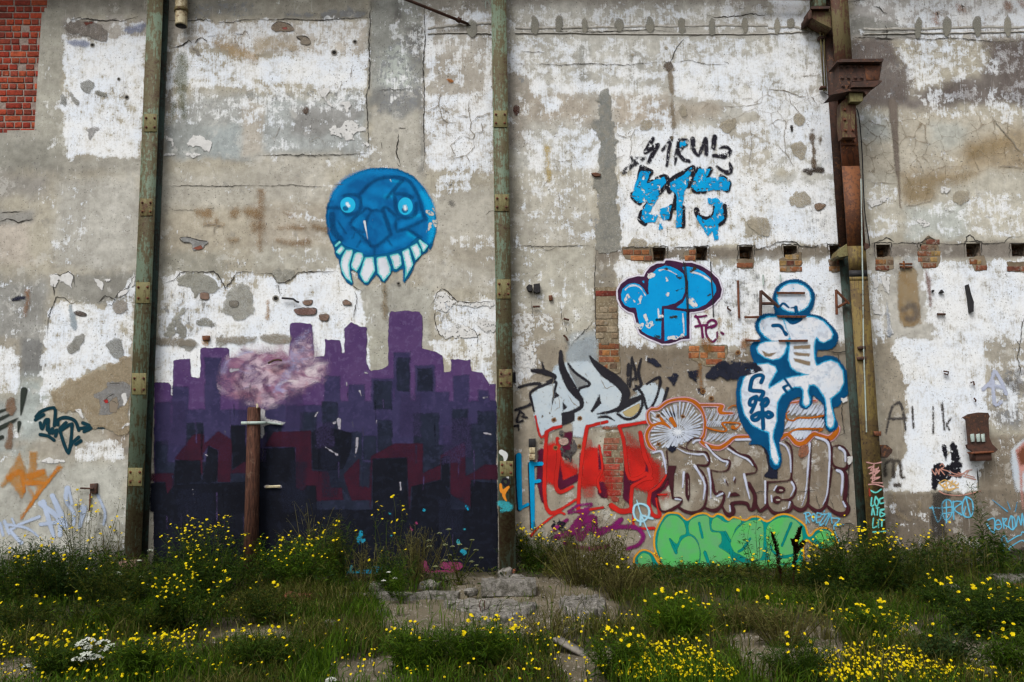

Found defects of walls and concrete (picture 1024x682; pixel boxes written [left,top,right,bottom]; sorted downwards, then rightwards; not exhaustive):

spalling [271,21,311,45]
crack [169,8,488,185]
peeling [163,135,213,158]
crack [863,114,1022,206]
spalling [737,244,755,269]
flaking render [779,244,803,272]
flaking render [917,218,941,269]
flaking render [964,240,988,272]
spalling [1007,243,1024,272]
spalling [67,333,85,354]
flaking render [594,287,664,376]
spalling [50,338,132,436]